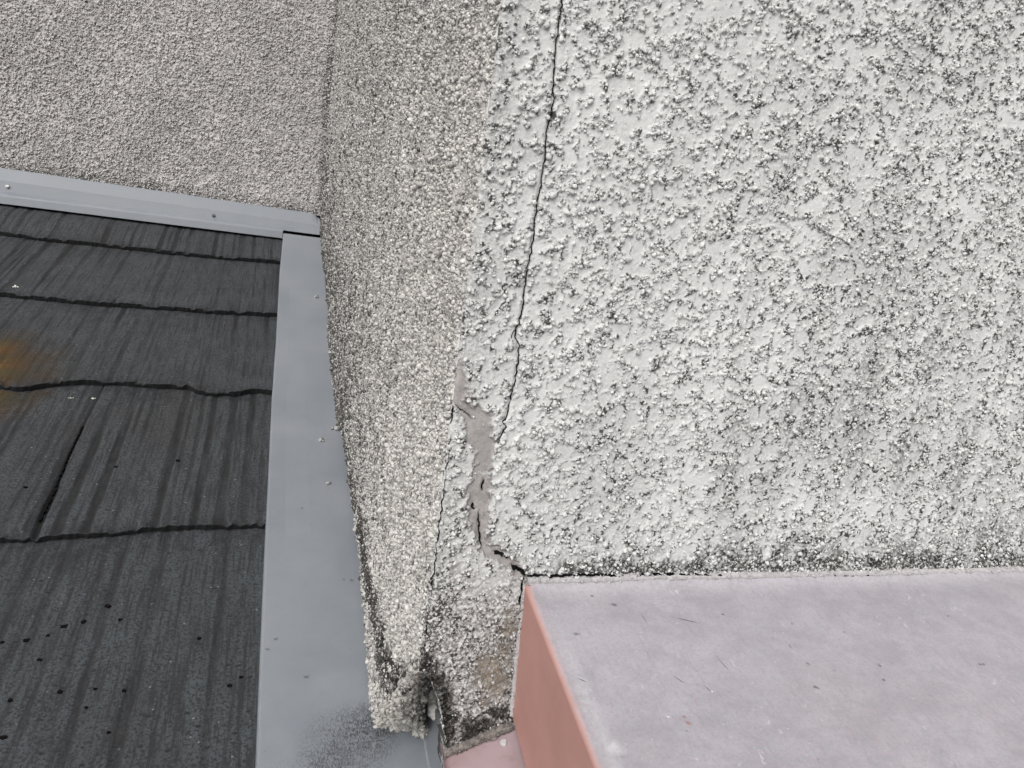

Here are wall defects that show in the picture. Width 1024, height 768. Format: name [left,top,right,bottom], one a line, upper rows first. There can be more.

crack [498,0,563,444]
crack [423,405,471,649]
spalling [453,358,525,577]
damp [419,600,524,748]